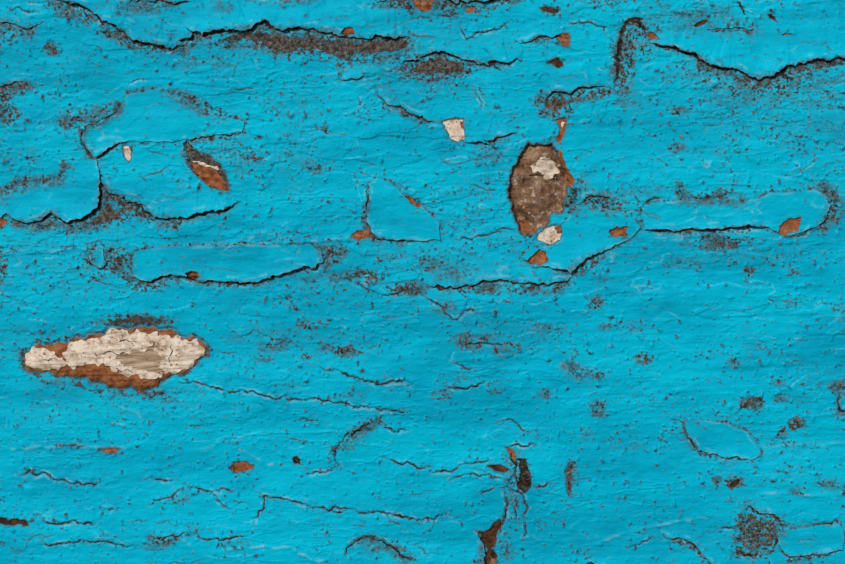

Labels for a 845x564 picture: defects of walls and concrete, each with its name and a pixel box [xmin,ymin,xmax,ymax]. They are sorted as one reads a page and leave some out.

peeling [58,0,845,145]
peeling [0,90,245,227]
peeling [531,156,560,180]
peeling [89,248,107,270]
peeling [423,183,835,291]
peeling [24,326,207,392]
peeling [490,447,531,493]
crack [256,495,447,521]
peeling [470,519,501,564]